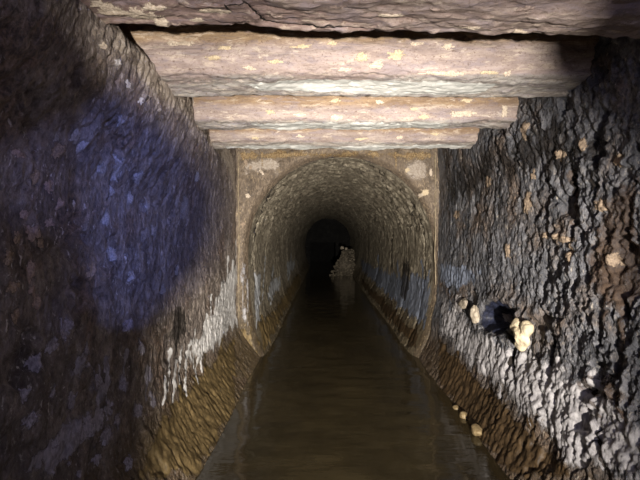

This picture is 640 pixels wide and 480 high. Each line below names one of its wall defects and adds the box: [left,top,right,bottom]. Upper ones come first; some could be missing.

crack [224,0,342,28]
leakage [24,316,74,373]
leakage [25,341,121,476]
leakage [122,241,301,480]